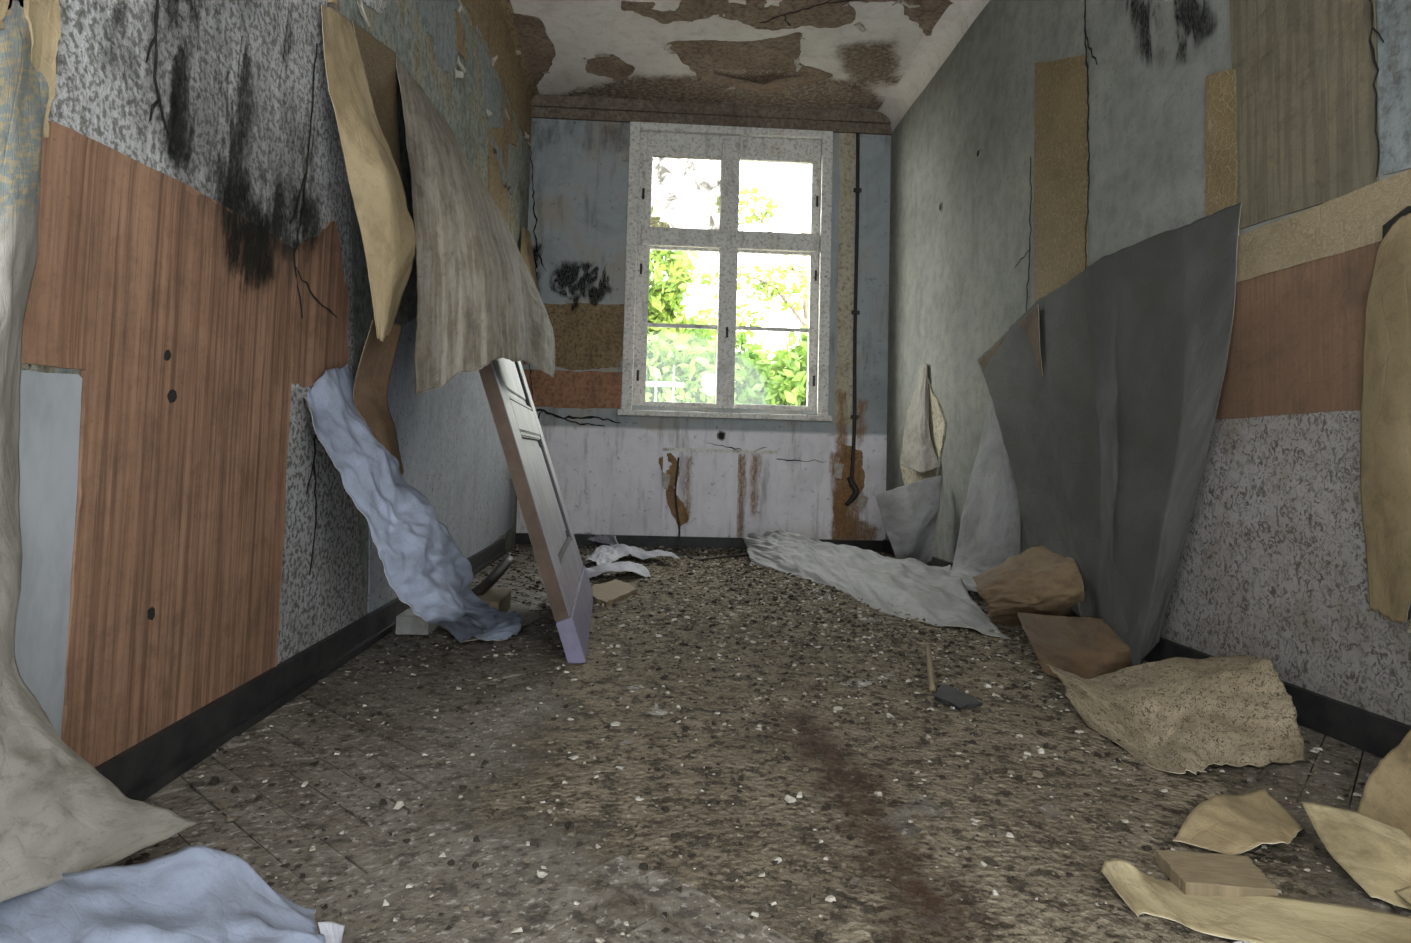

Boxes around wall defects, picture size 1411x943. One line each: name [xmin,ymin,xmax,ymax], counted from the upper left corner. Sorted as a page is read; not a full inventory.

water stain [162,0,199,171]
water stain [274,18,292,61]
peeling [583,54,635,80]
peeling [621,0,953,94]
water stain [216,40,320,286]
rust [737,455,757,536]
rust [831,392,877,540]